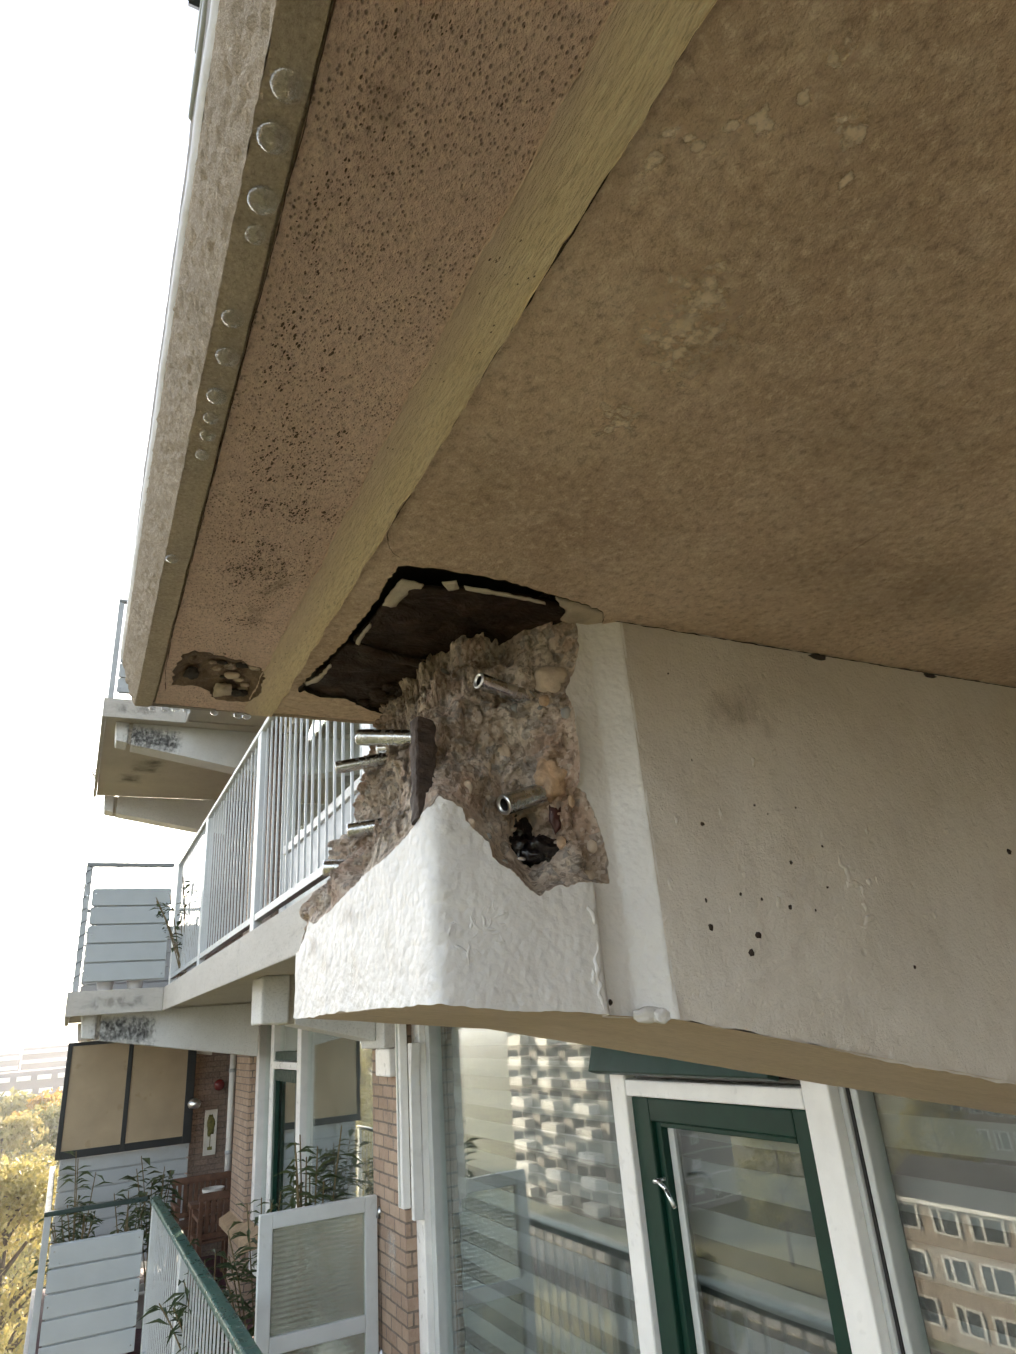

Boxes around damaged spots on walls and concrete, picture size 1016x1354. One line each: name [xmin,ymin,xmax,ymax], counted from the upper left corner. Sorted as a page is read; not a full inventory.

spalling [427,12,481,71]
spalling [172,87,395,702]
corrosion [409,716,438,825]
spalling [297,566,609,952]